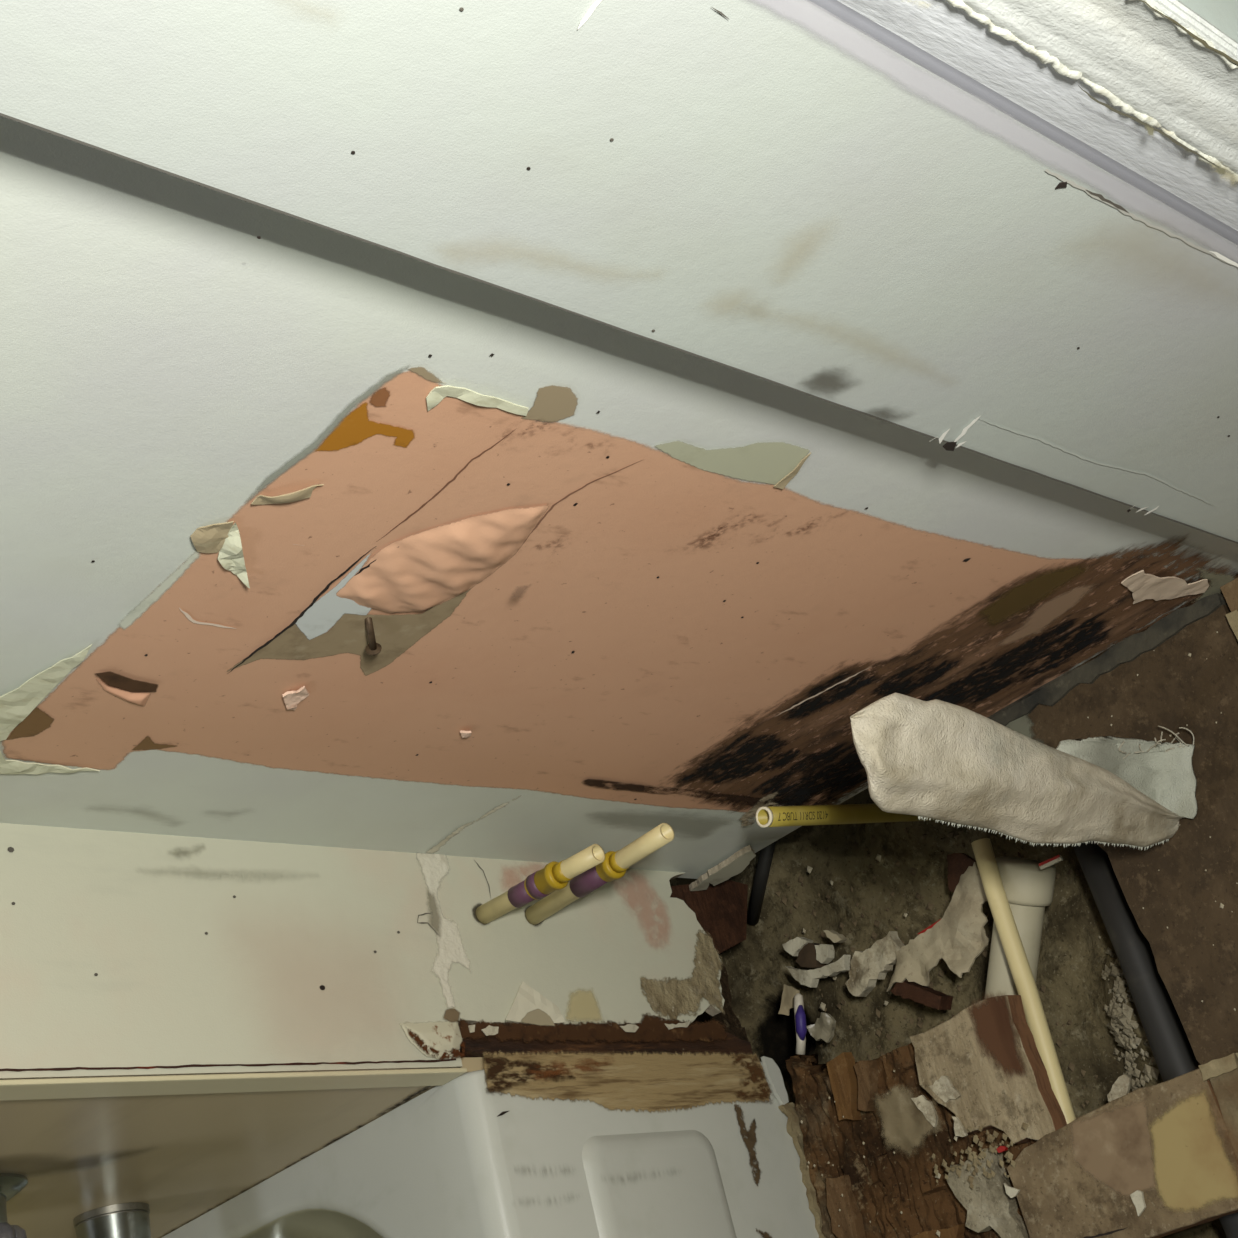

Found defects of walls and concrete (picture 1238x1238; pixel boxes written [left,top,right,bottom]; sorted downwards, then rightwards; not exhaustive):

crack [1078,85,1225,174]
crack [0,113,1238,553]
peeling [0,367,1192,826]
damp [584,539,1238,811]
flaking render [640,930,724,1020]